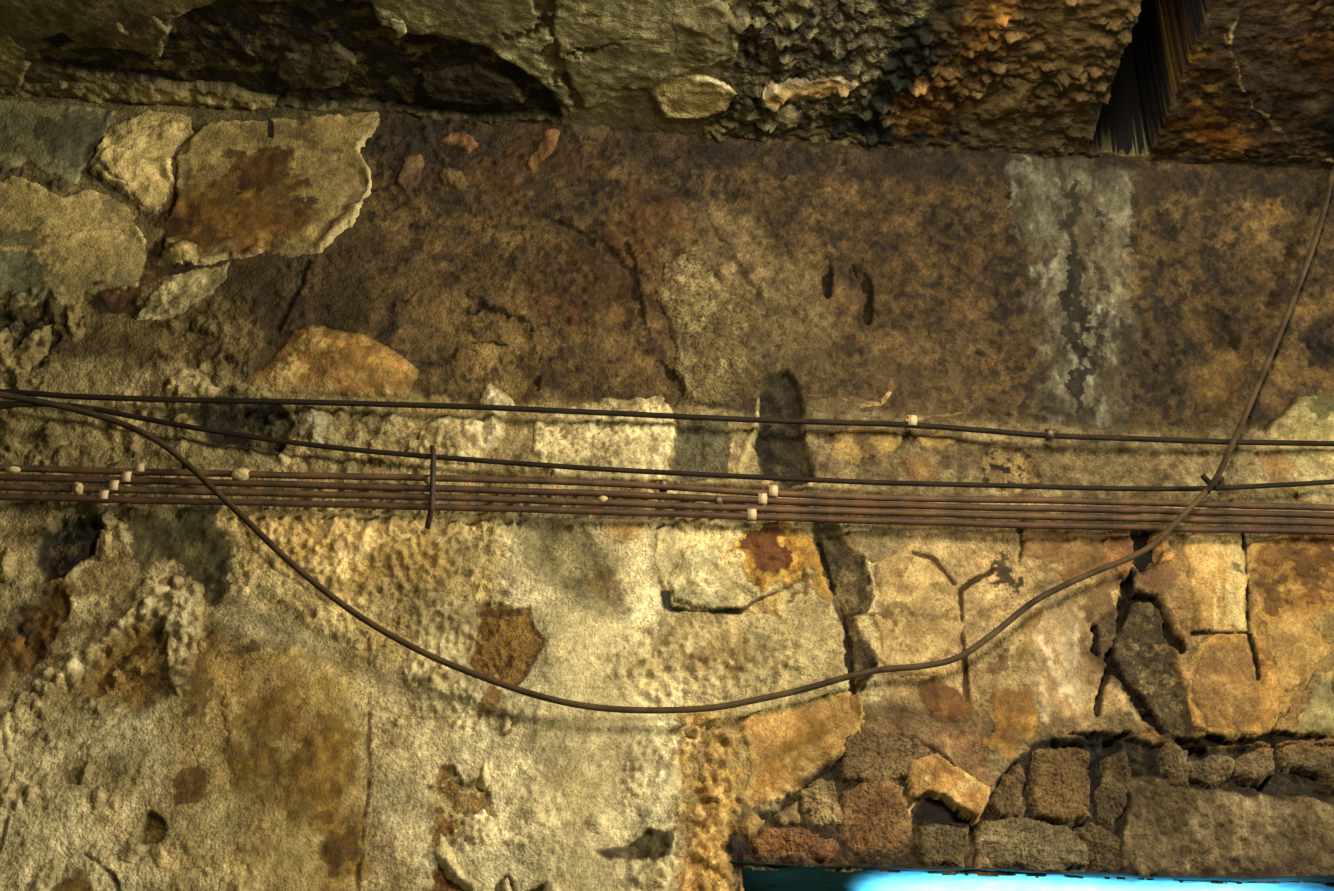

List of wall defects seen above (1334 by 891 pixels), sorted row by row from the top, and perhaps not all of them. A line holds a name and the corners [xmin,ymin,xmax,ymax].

efflorescence [1008,153,1132,430]
flaking render [13,511,103,671]
flaking render [87,621,167,711]
crack [355,638,371,890]
crack [661,590,779,614]
flaking render [739,522,1334,873]
crack [1057,533,1326,754]